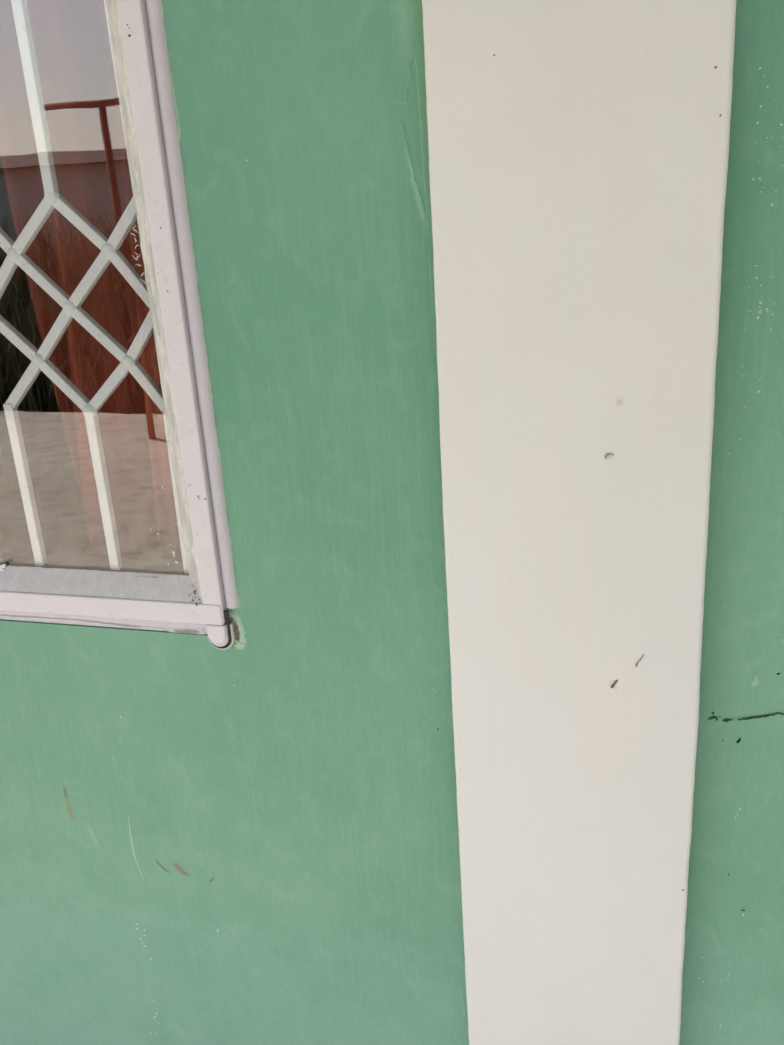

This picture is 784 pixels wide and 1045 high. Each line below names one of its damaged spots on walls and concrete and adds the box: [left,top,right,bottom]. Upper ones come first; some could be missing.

crack [708,710,784,723]